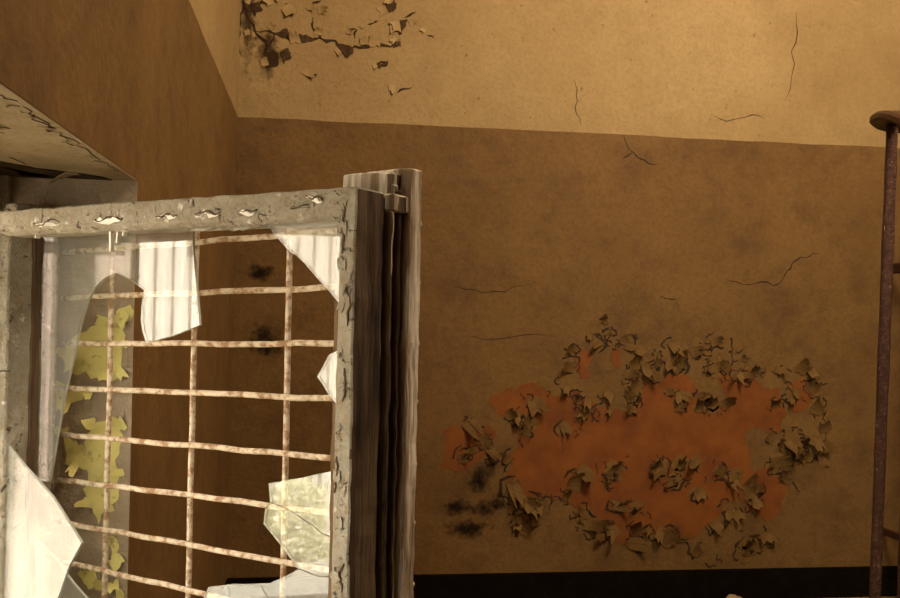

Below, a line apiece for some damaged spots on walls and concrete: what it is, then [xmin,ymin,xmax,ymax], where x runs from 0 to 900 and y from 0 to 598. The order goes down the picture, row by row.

peeling [240,0,434,69]
crack [785,23,798,100]
crack [0,95,118,171]